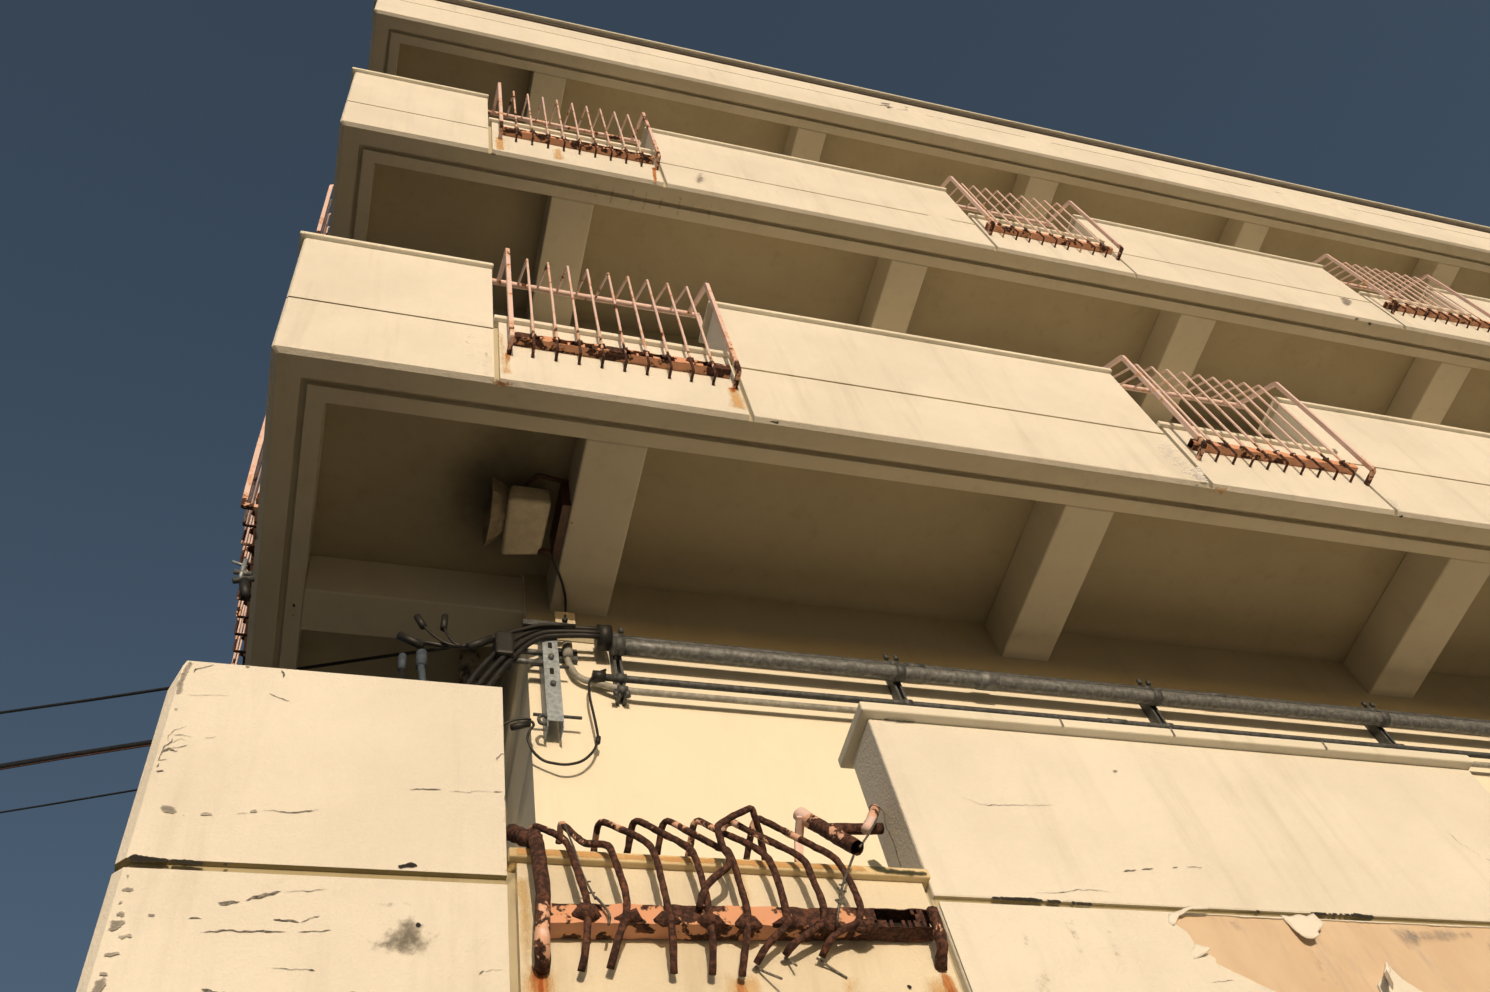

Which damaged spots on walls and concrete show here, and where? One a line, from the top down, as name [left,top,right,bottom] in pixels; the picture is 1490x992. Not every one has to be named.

peeling [92,875,133,992]
peeling [1168,906,1490,992]
rust [529,967,552,992]
rust [735,979,756,992]
rust [933,973,957,992]